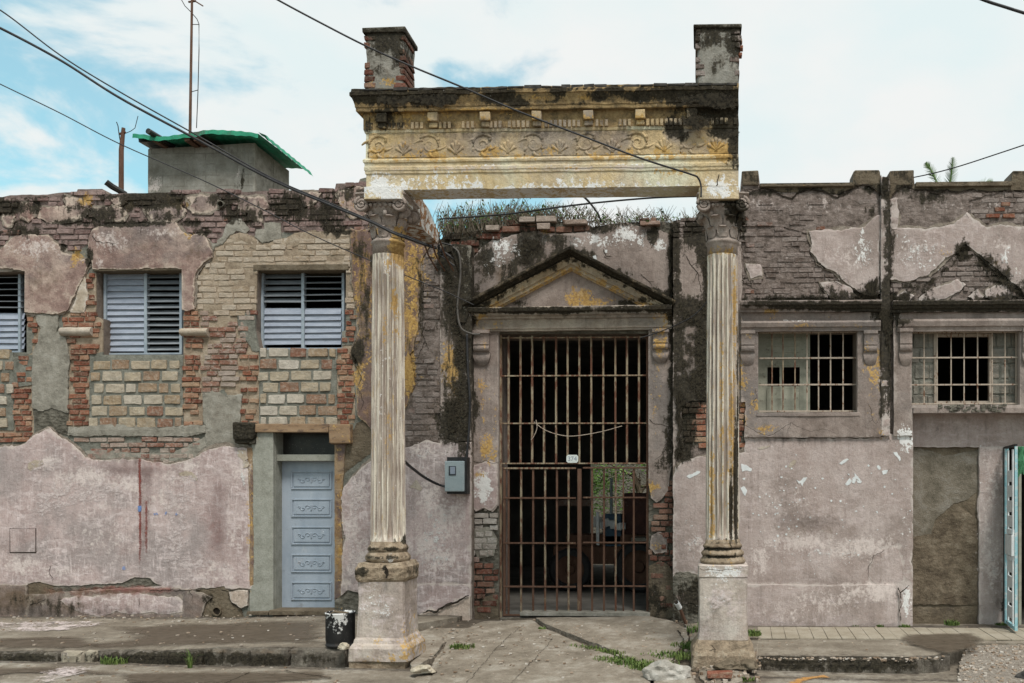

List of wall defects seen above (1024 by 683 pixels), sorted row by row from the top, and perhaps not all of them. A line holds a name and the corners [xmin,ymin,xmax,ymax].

damp [677,92,736,131]
flaking render [739,186,1024,304]
damp [882,177,890,200]
flaking render [0,181,394,570]
damp [443,259,468,436]
damp [669,229,707,468]
damp [823,243,1024,409]
flaking render [28,577,162,594]
corrosion [138,458,147,559]
flaking render [196,586,244,618]
flaking render [474,506,500,619]
flaking render [648,467,701,620]